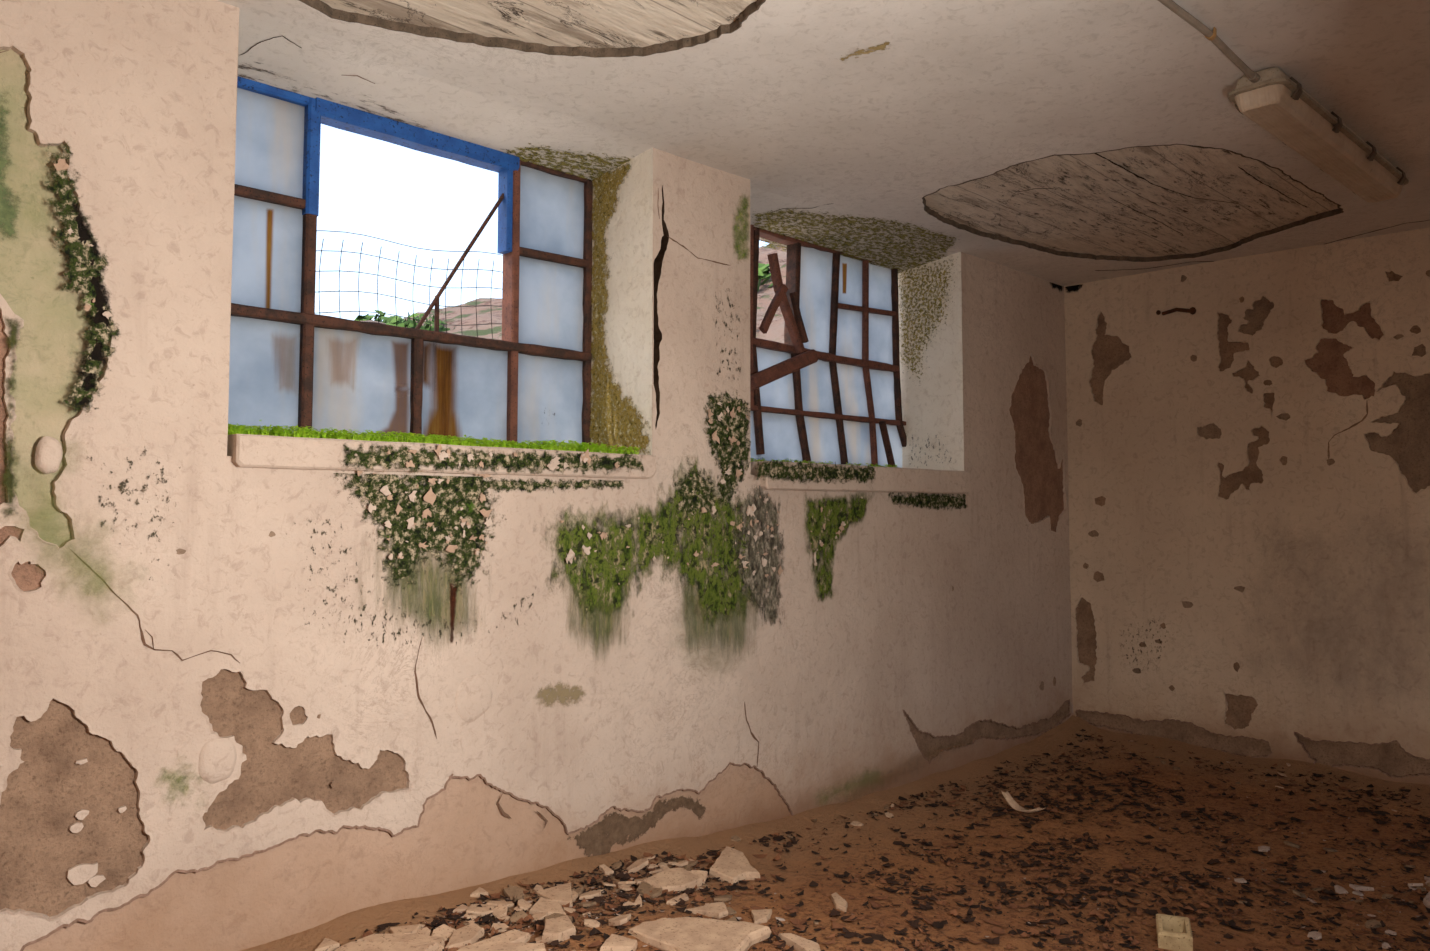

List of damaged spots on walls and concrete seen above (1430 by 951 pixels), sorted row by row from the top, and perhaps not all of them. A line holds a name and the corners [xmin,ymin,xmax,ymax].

flaking render [0,43,115,594]
crack [653,185,728,428]
spalling [1009,351,1066,534]
spalling [1216,295,1290,501]
crack [1328,383,1395,459]
spalling [1303,298,1430,495]
crack [70,549,240,663]
water stain [295,519,536,646]
water stain [733,487,784,625]
flaking render [0,667,793,951]
flaking render [902,692,1273,764]
flaking render [1294,732,1430,778]